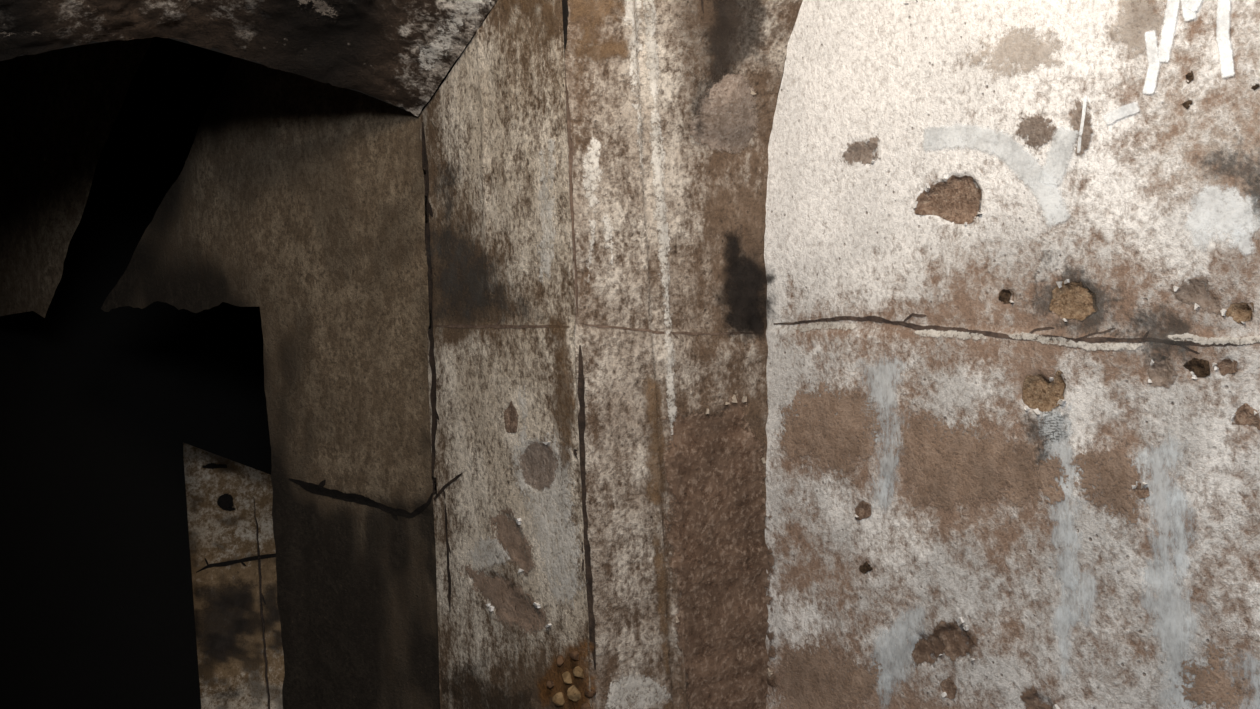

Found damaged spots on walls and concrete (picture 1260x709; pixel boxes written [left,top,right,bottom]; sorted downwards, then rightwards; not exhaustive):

damp [725,233,741,265]
spalling [911,175,982,225]
damp [748,315,765,336]
crack [288,0,1260,669]
crack [196,497,276,709]
peeling [459,506,552,634]